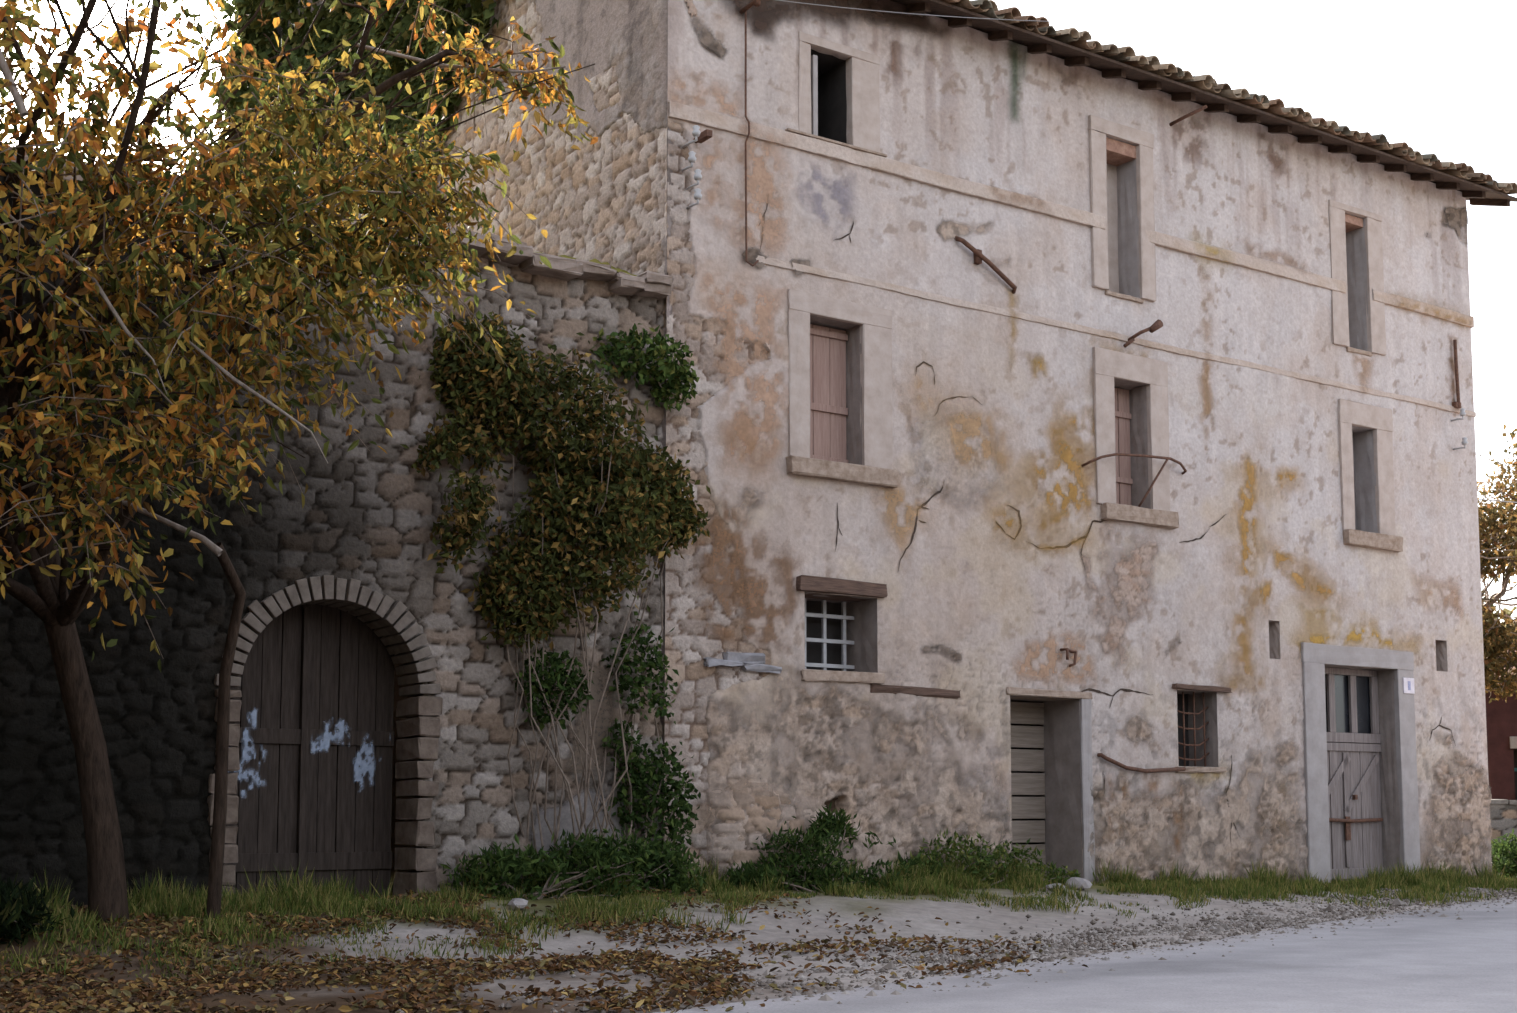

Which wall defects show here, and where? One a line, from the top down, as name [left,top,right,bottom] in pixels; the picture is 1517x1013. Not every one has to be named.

spalling [791,259,810,276]
crack [915,361,982,415]
flaking render [433,0,771,884]
water stain [950,413,1004,463]
water stain [885,489,916,543]
crack [898,486,943,571]
crack [996,505,1120,568]
crack [1179,514,1226,543]
water stain [1259,551,1332,602]
spalling [1126,716,1153,742]
spalling [1088,741,1303,884]
flaking render [1428,734,1492,880]